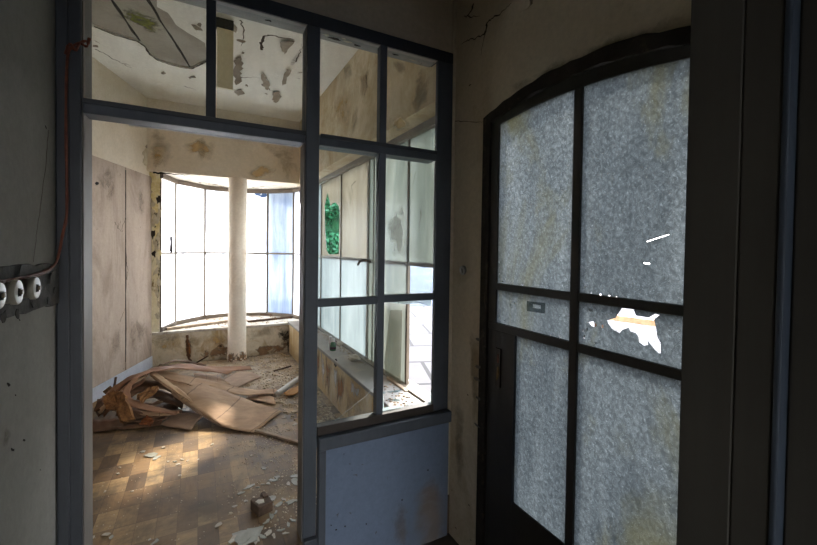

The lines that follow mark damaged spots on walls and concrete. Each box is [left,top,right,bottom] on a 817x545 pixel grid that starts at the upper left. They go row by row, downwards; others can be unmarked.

flaking render [92,0,206,79]
peeling [233,20,303,103]
flaking render [204,344,247,362]
flaking render [257,342,288,355]